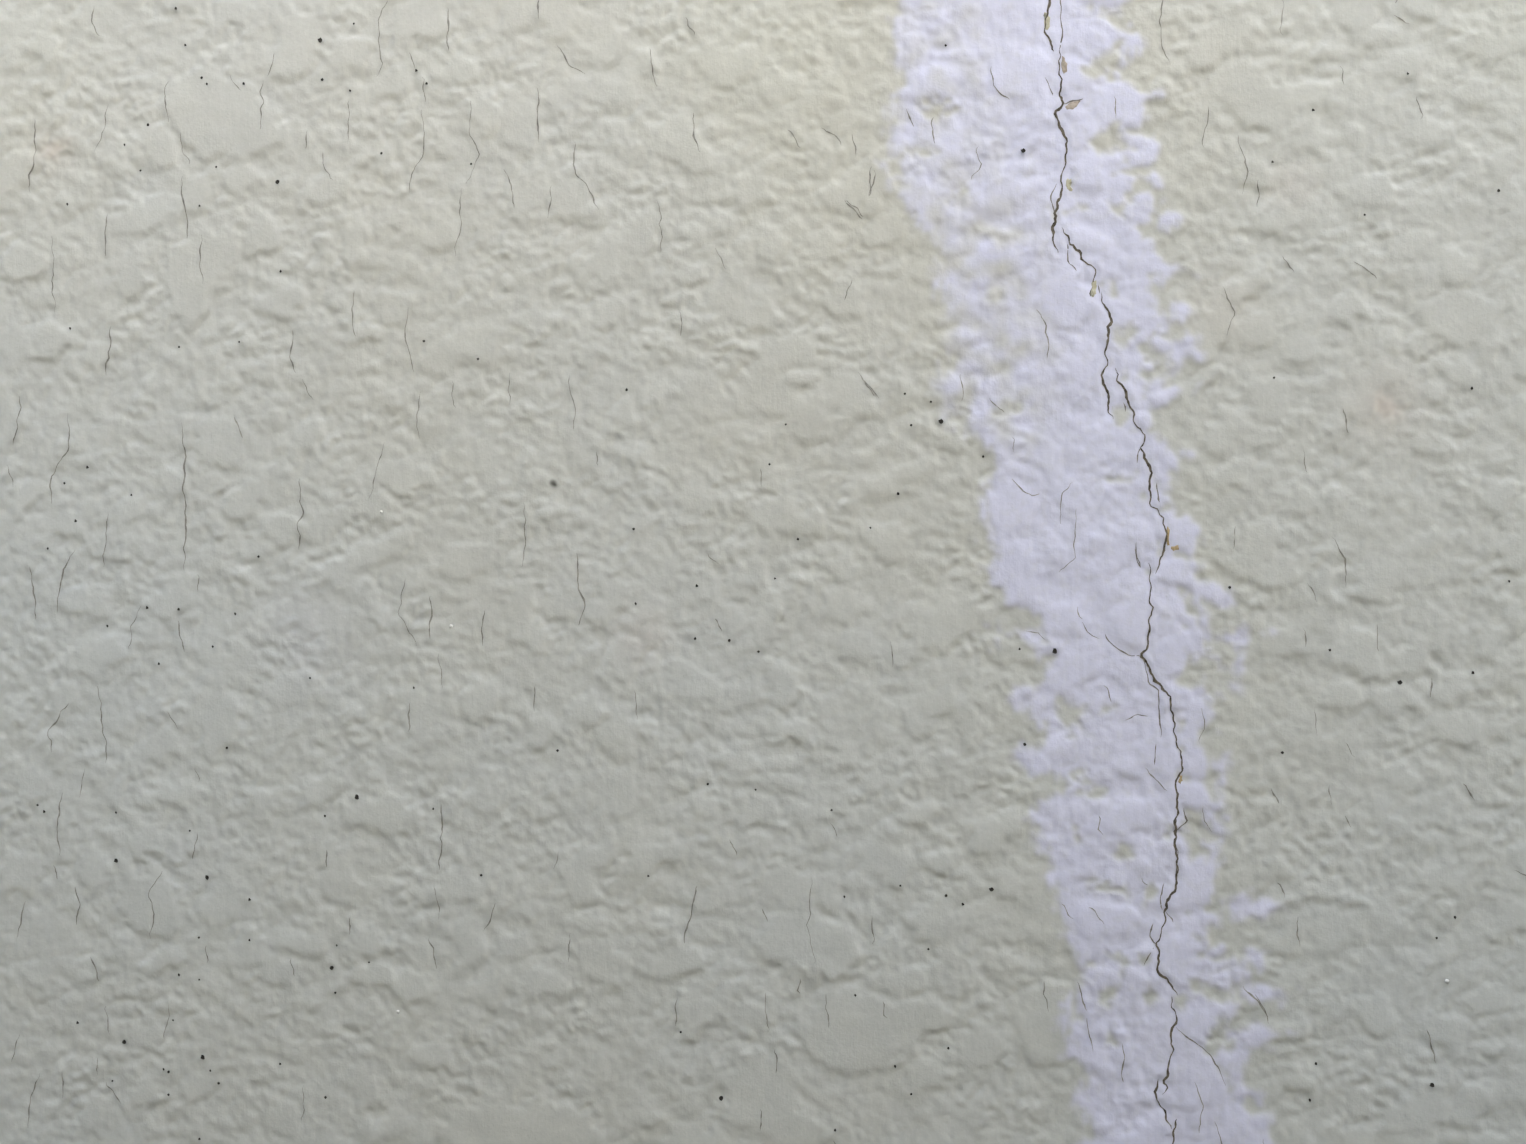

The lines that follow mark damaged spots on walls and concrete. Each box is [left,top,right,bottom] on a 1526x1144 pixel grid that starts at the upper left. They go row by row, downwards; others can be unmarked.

crack [1202,108,1260,203]
crack [1037,310,1049,357]
crack [960,378,1076,572]
crack [1043,0,1226,1144]
crack [1243,987,1269,1022]